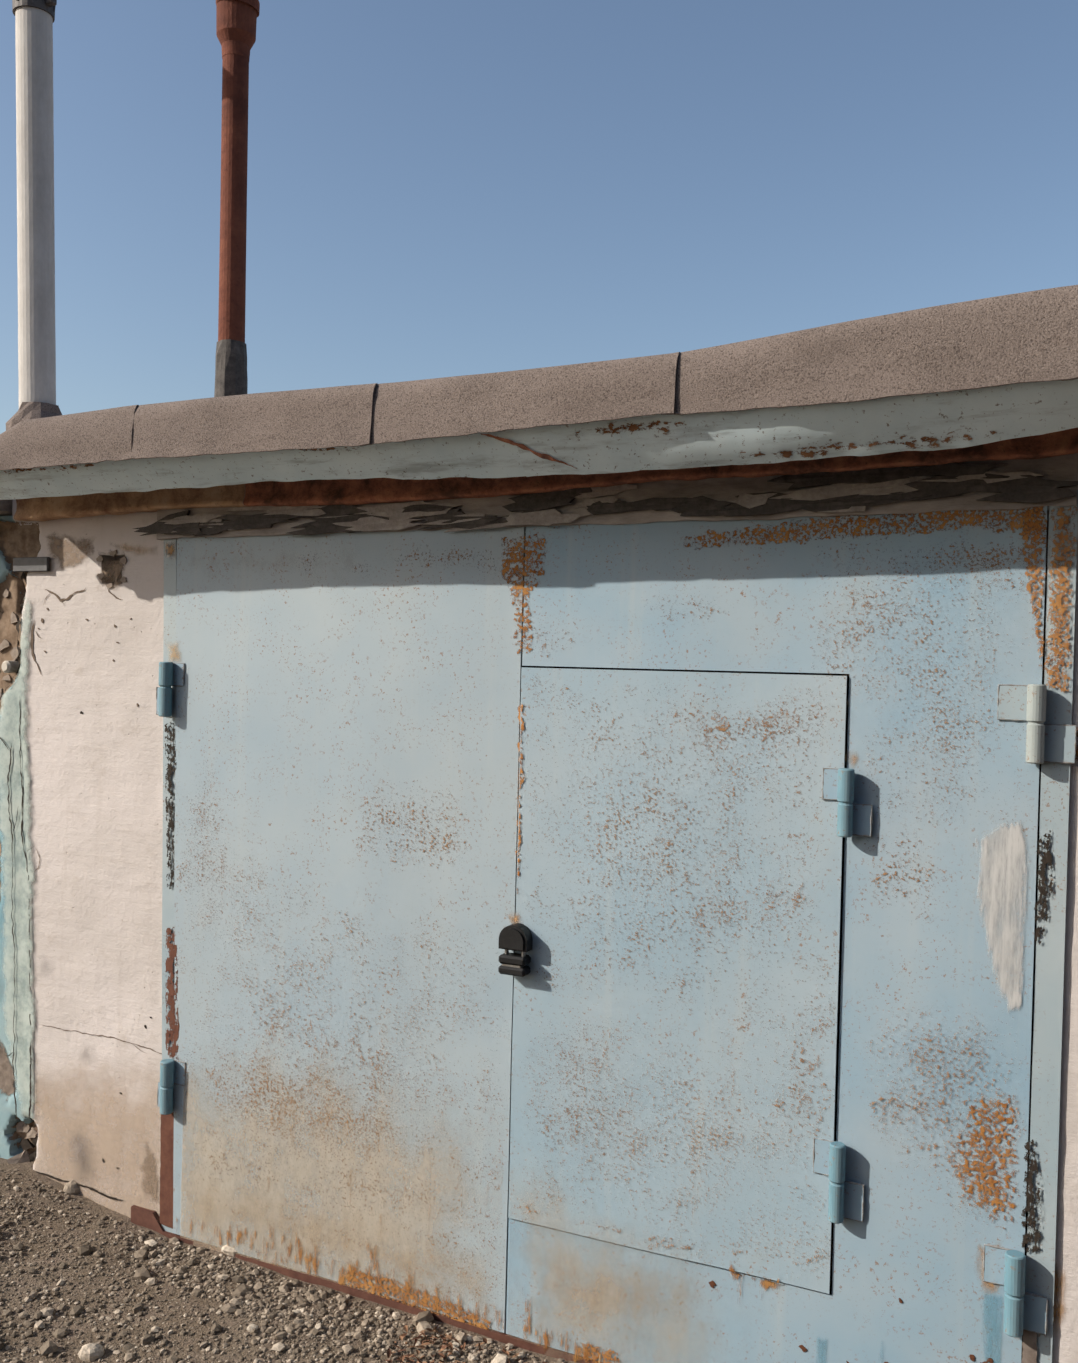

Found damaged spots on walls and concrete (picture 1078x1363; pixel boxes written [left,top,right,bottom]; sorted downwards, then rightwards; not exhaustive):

peeling [133,462,1078,536]
spalling [0,521,41,709]
spalling [96,550,127,588]
rust [395,534,576,658]
rust [865,833,946,921]
rust [176,760,507,1330]
rust [512,679,836,1294]
rust [866,1009,1026,1229]
rust [523,1302,619,1363]